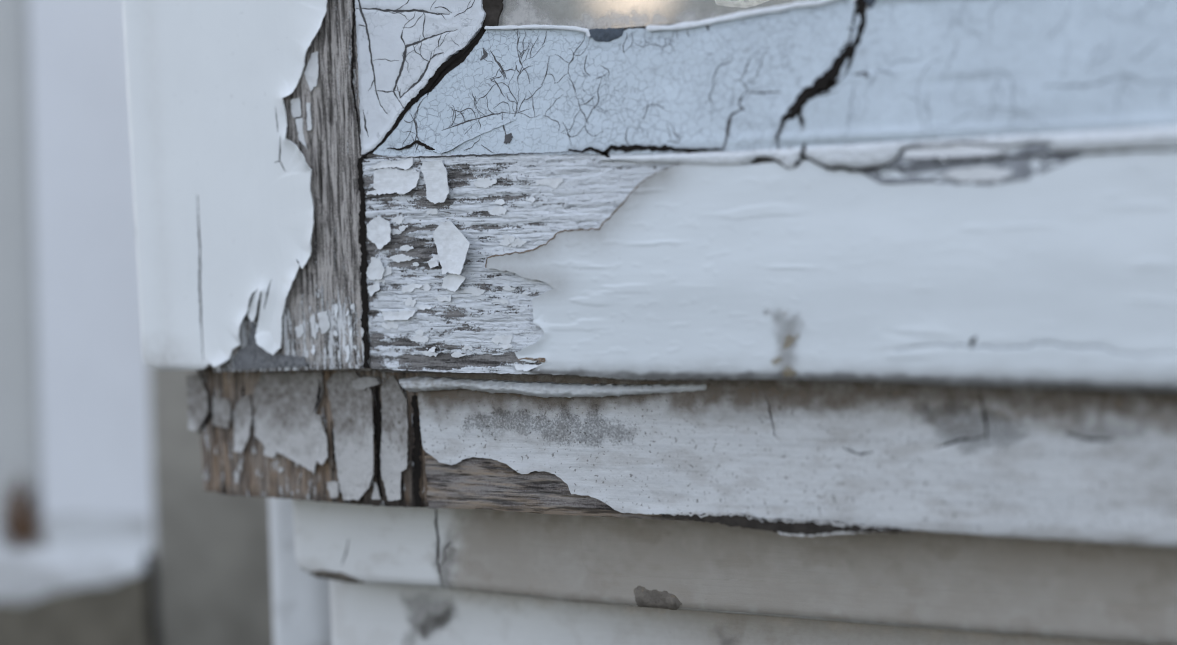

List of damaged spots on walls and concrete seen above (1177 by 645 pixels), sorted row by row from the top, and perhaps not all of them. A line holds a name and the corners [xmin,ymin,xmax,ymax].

crack [196,195,204,361]
peeling [186,0,730,522]
crack [351,0,1177,497]
crack [313,379,336,471]
crack [411,396,452,588]